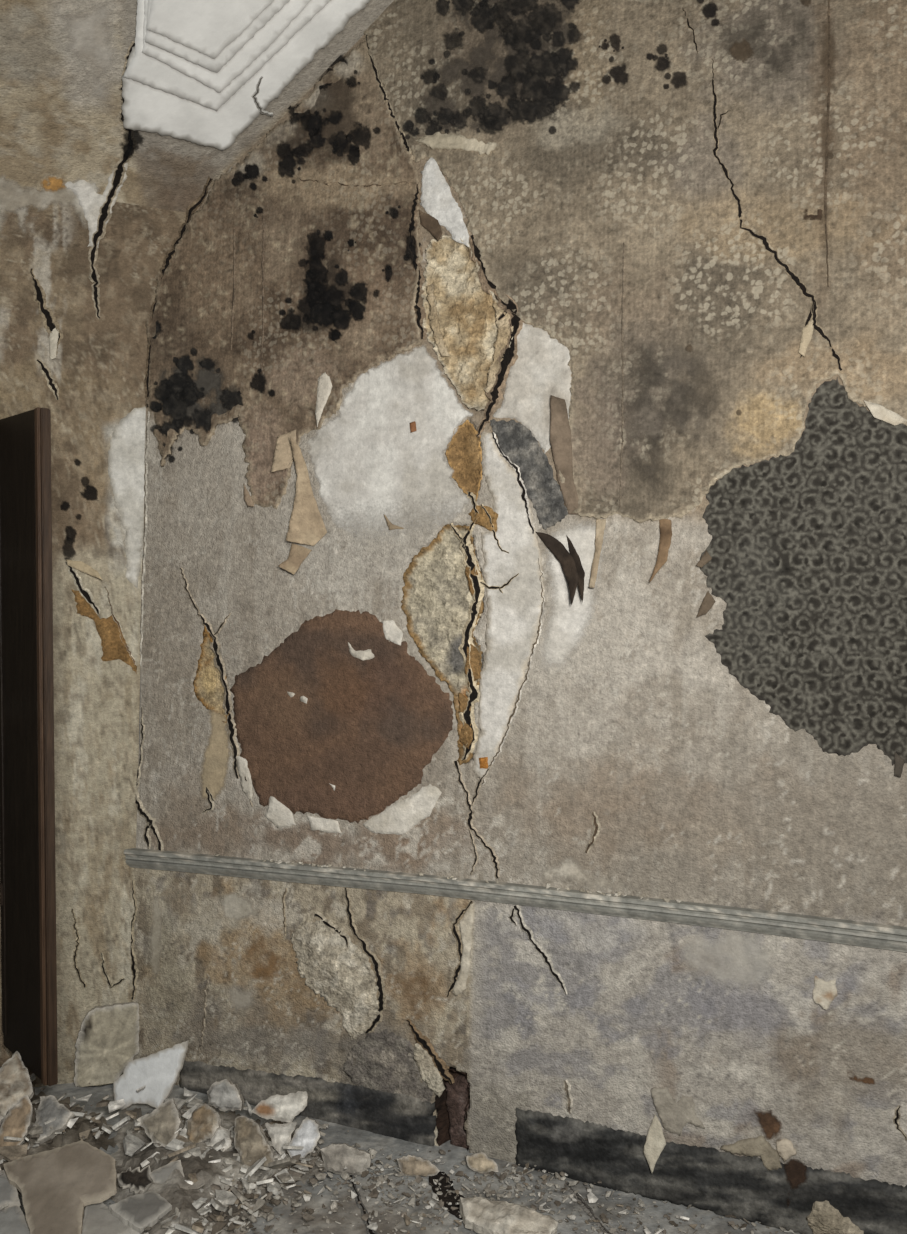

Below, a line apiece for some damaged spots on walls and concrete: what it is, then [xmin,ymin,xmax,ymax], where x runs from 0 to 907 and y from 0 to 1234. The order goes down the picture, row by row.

mould [399,0,580,139]
crack [88,41,135,319]
mould [279,230,393,342]
mould [404,226,421,264]
crack [682,0,842,371]
mould [150,348,275,462]
peeling [864,400,907,426]
flaking render [193,132,605,835]
crack [446,235,545,998]
crack [282,888,455,1084]
flaking render [343,1029,470,1150]
spalling [429,1171,465,1220]